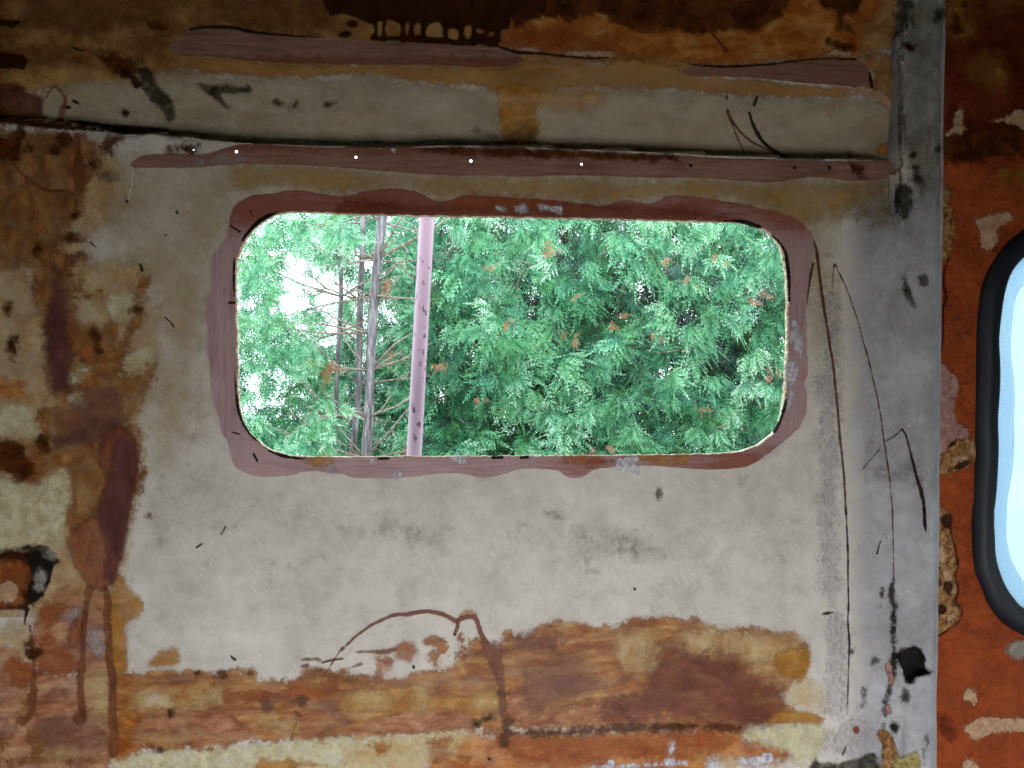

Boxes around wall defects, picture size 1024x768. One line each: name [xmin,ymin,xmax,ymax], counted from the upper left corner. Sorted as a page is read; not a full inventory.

water stain [0,0,917,159]
crack [726,93,790,158]
water stain [894,152,923,219]
peeling [976,211,1013,253]
water stain [47,144,195,476]
water stain [0,196,143,673]
rust [0,83,825,768]
crack [807,241,927,733]
spalling [939,363,976,475]
spalling [0,545,59,611]
spalling [938,504,963,637]
rust [936,717,957,742]